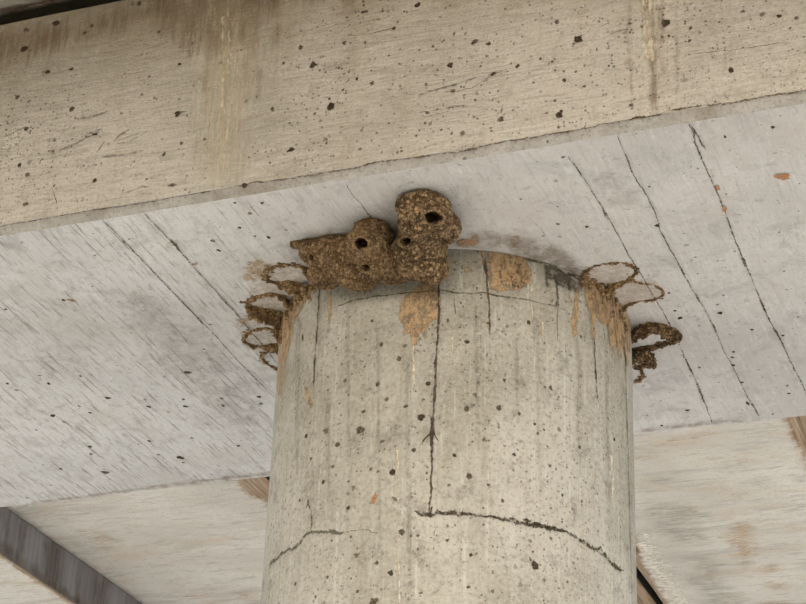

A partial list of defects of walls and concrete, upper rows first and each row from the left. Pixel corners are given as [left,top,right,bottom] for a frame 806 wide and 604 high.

crack [269,499,374,566]
crack [313,251,632,581]
crack [230,90,806,423]